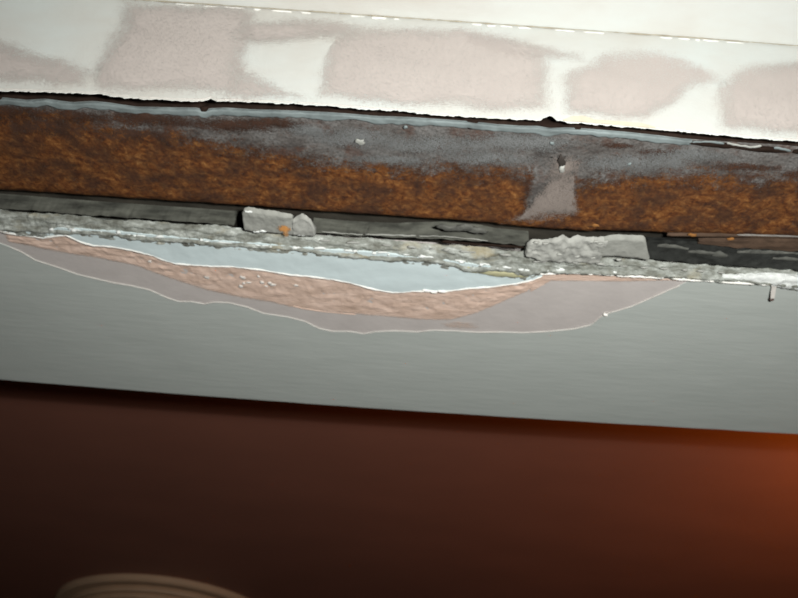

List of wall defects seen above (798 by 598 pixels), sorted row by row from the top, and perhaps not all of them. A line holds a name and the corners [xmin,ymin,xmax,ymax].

rust [0,104,798,240]
peeling [0,194,798,334]